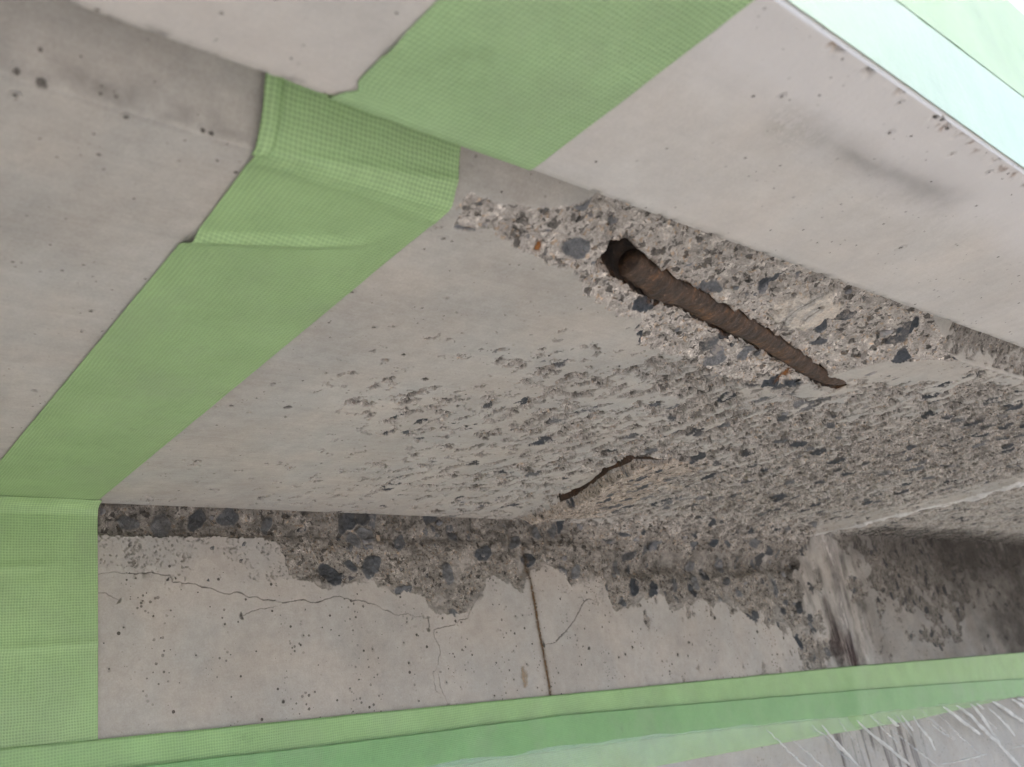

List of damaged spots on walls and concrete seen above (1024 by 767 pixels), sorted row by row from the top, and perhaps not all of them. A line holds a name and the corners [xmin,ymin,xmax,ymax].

corrosion [619,250,846,385]
spalling [98,192,1024,671]
crack [98,566,482,706]